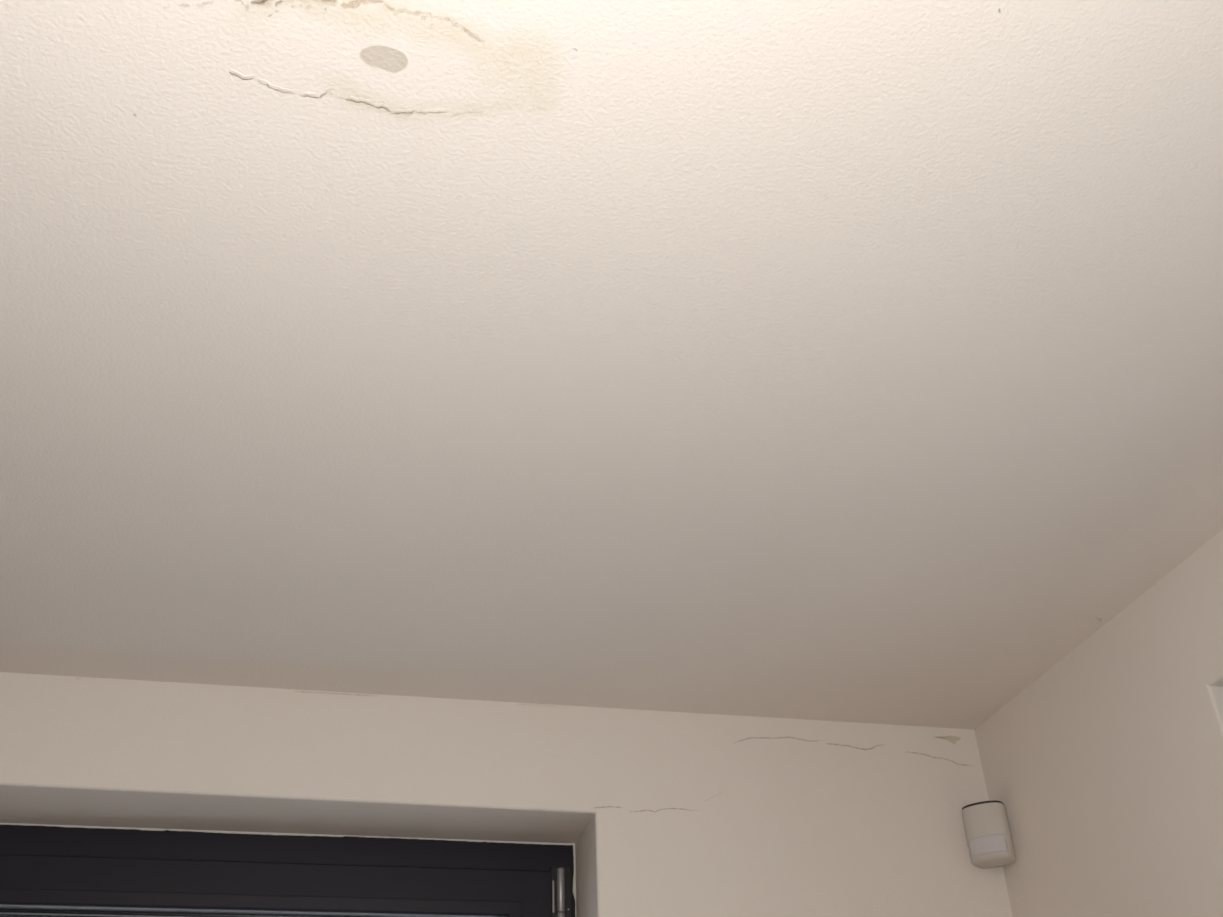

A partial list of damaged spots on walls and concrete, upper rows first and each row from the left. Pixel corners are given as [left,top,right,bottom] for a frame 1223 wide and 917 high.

peeling [253,0,337,17]
leakage [194,0,581,130]